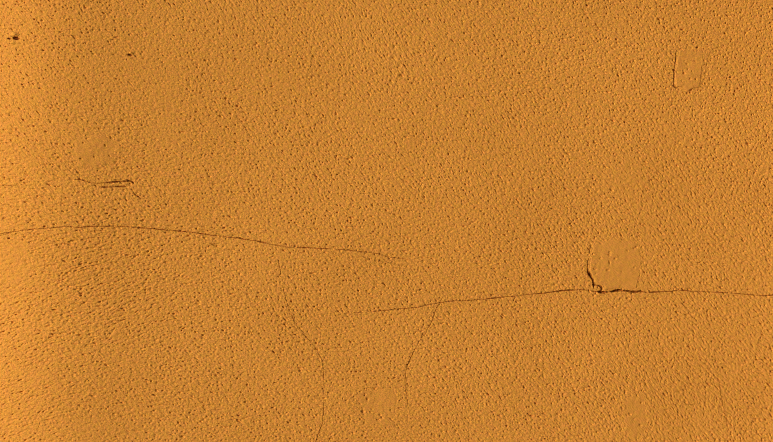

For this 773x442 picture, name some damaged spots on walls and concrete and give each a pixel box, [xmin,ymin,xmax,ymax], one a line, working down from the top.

crack [75,179,141,199]
crack [0,226,408,378]
crack [335,250,773,405]